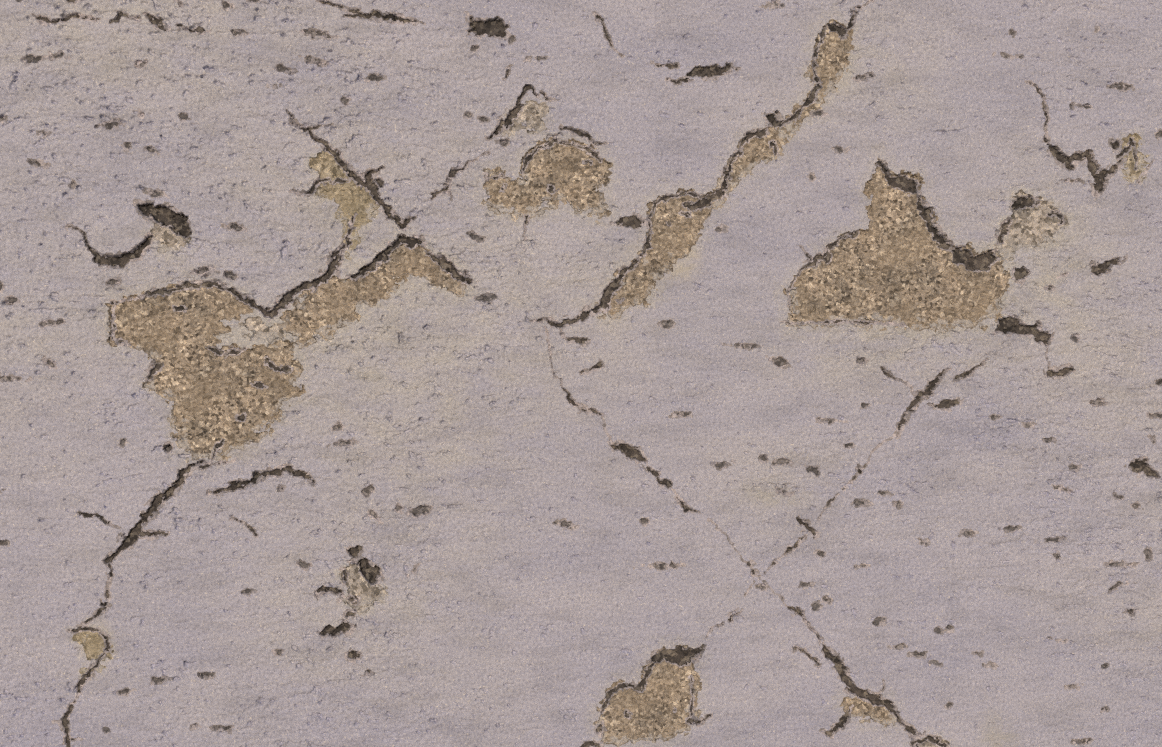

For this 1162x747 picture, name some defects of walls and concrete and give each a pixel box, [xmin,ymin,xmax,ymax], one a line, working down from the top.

crack [231,64,609,322]
spalling [481,133,648,250]
spalling [650,60,741,86]
spalling [810,109,830,118]
spalling [830,145,851,154]
crack [1024,80,1154,200]
spalling [105,151,498,463]
crack [529,0,989,747]
spalling [780,158,1076,380]
crack [51,438,316,747]
spalling [580,608,743,747]